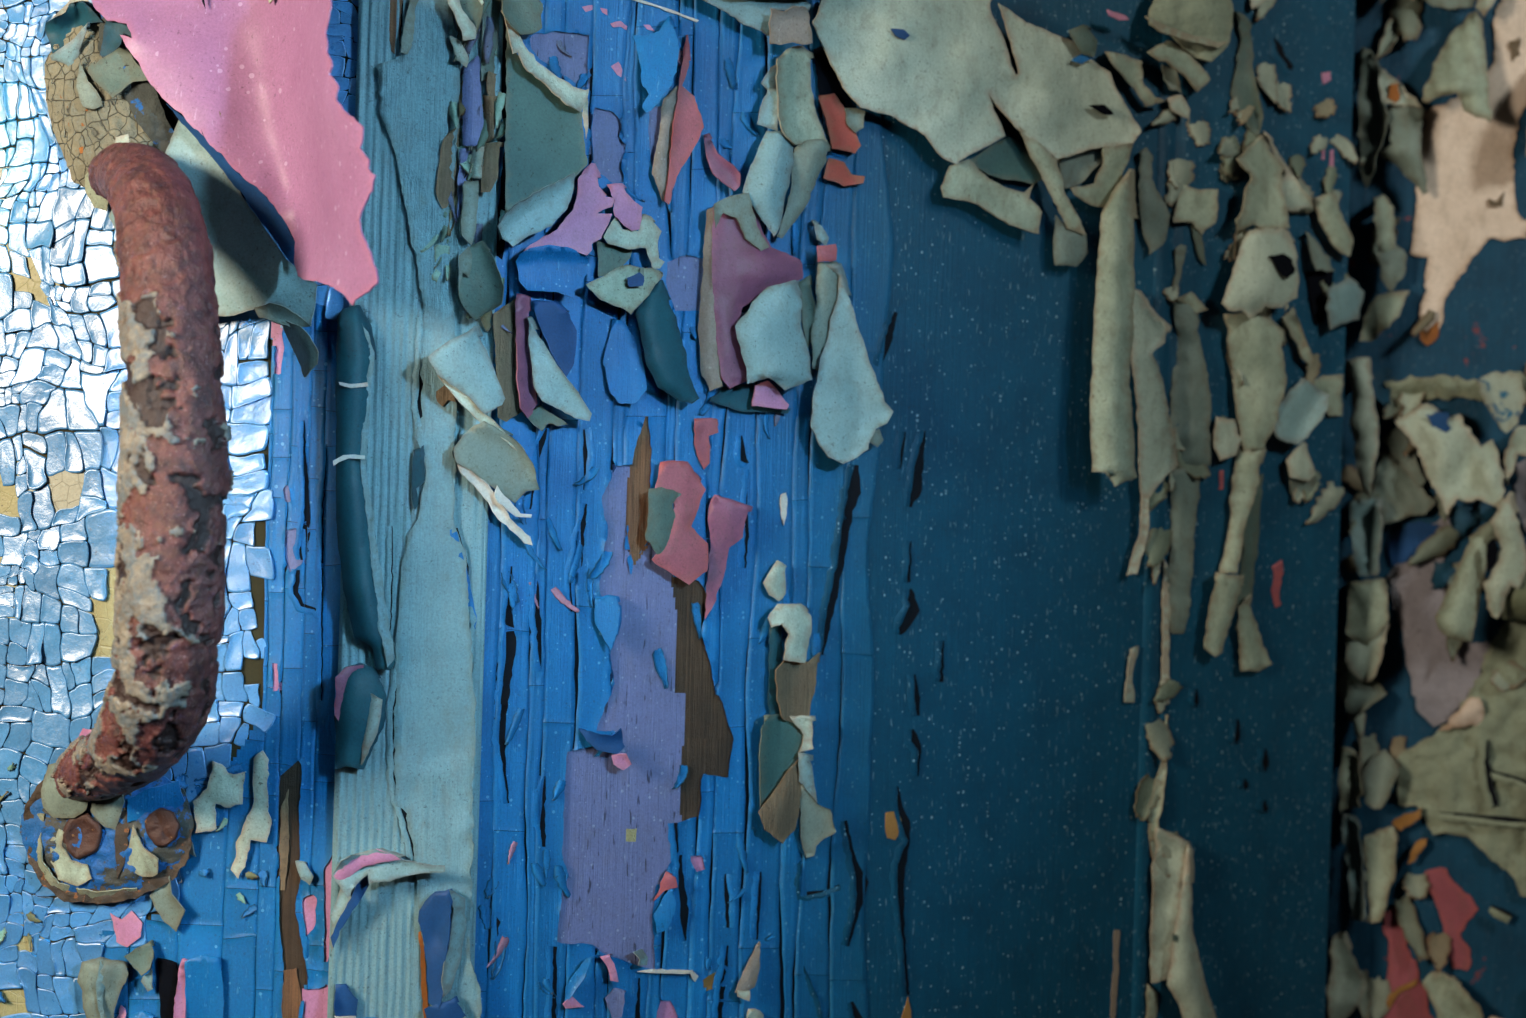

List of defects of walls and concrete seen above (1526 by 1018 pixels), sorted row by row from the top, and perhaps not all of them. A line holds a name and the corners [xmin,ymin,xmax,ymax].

crack [327,0,359,118]
peeling [648,19,704,213]
peeling [819,94,868,186]
peeling [1151,62,1292,208]
peeling [1368,0,1526,346]
peeling [585,241,703,339]
crack [0,0,349,1018]
peeling [501,388,734,969]
crack [450,0,944,1018]
peeling [1387,492,1526,731]
corrosion [23,775,194,904]
peeling [1358,808,1478,1018]